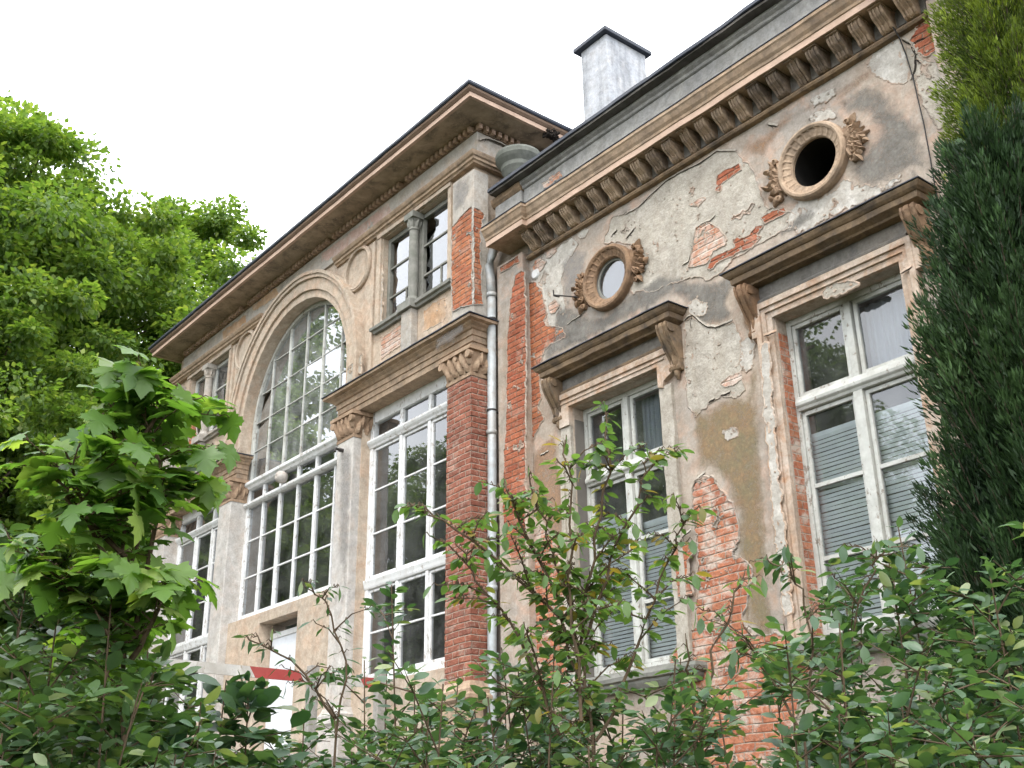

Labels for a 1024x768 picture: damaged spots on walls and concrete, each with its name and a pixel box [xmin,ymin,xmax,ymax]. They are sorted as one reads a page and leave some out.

spalling [866,19,947,130]
flaking render [423,206,485,332]
spalling [603,151,902,295]
flaking render [499,228,590,699]
water stain [697,400,769,631]
spalling [683,295,794,617]
flaking render [670,475,813,768]